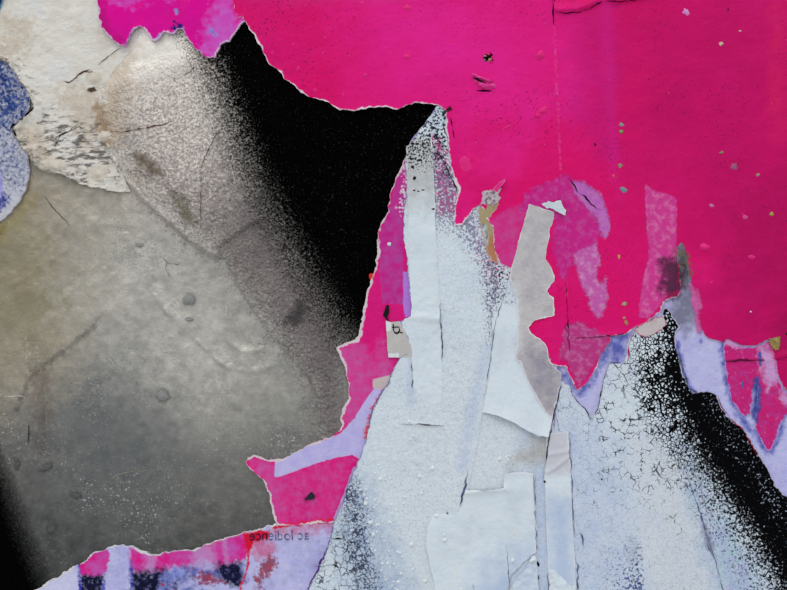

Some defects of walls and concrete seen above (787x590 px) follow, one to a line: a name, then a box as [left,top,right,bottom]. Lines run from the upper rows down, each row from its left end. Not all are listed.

crack [613,363,666,419]